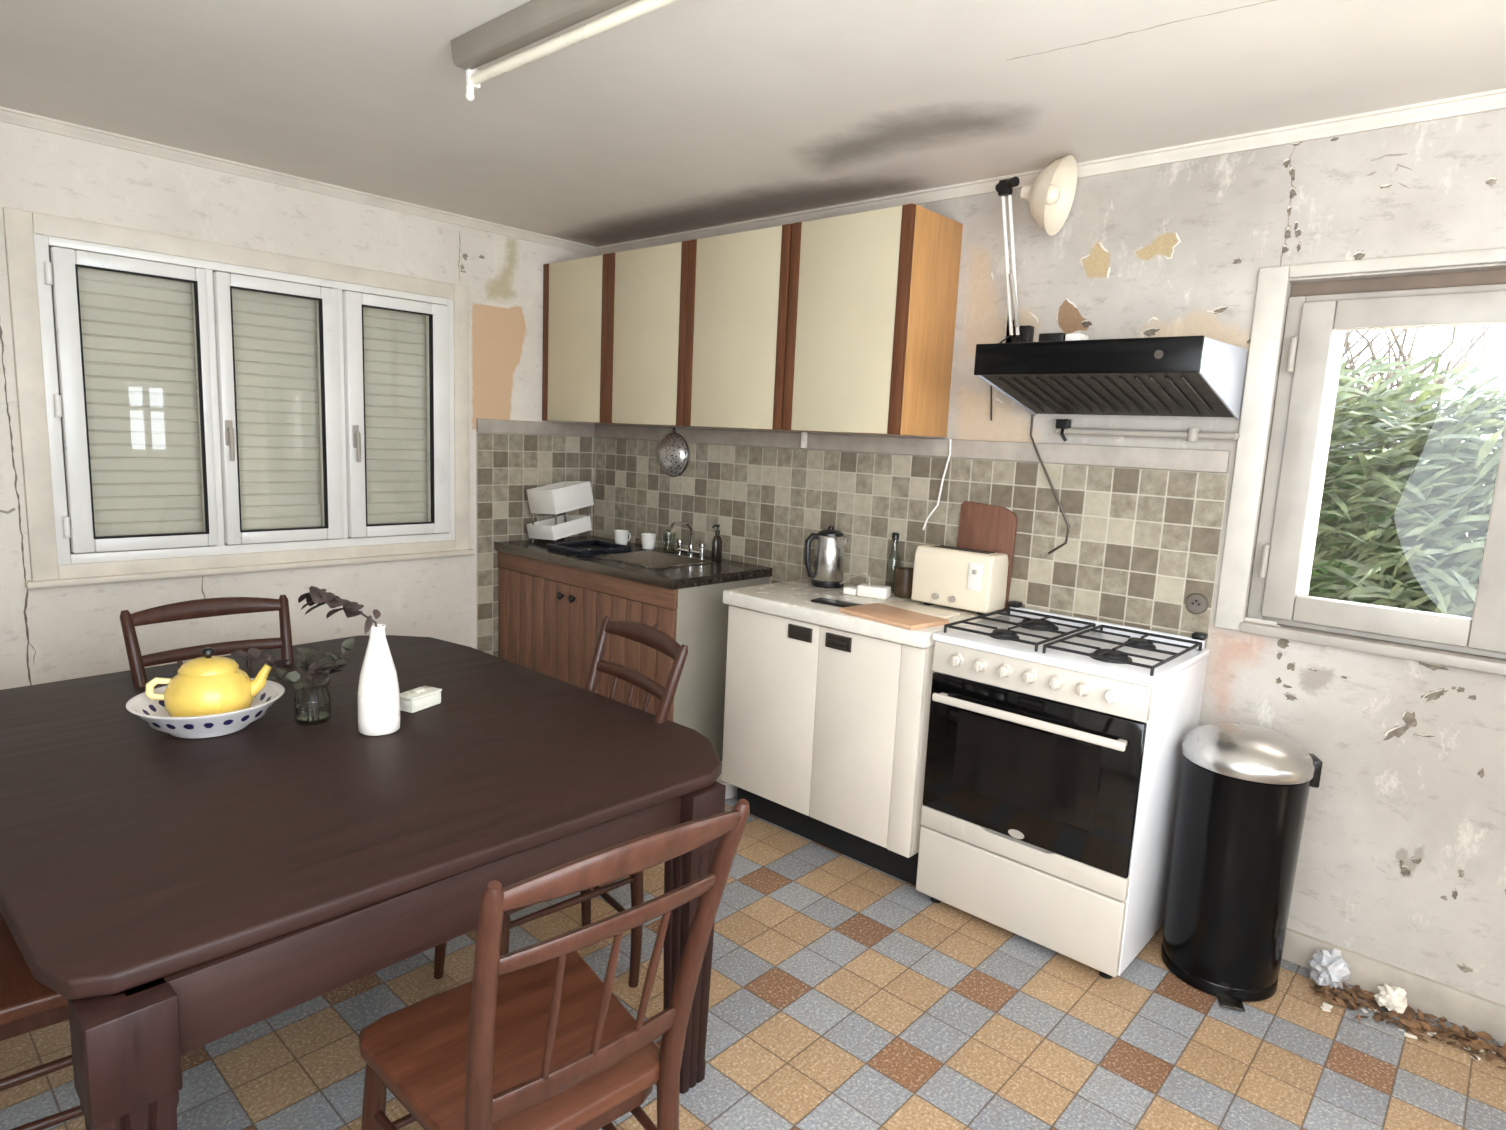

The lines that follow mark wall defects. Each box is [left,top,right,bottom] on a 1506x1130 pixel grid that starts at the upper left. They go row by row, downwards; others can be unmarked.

peeling [1078,238,1114,282]
peeling [1132,229,1182,264]
peeling [469,298,529,434]
peeling [947,236,1095,463]
flaking render [1275,638,1347,701]
flaking render [1383,661,1476,740]
flaking render [1391,842,1429,882]
flaking render [1440,869,1464,901]